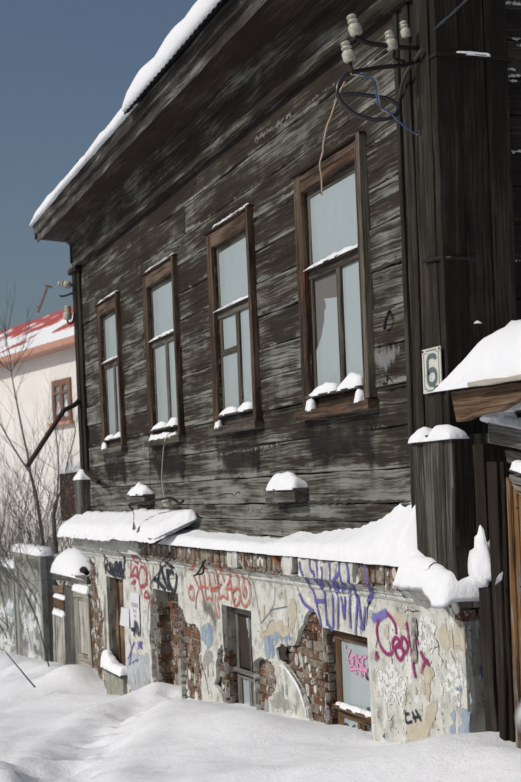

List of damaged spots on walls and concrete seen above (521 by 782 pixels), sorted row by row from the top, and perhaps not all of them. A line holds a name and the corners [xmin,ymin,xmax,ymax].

flaking render [89,557,106,688]
flaking render [182,609,235,703]
spalling [140,541,284,576]
flaking render [254,589,336,725]
peeling [376,601,483,742]